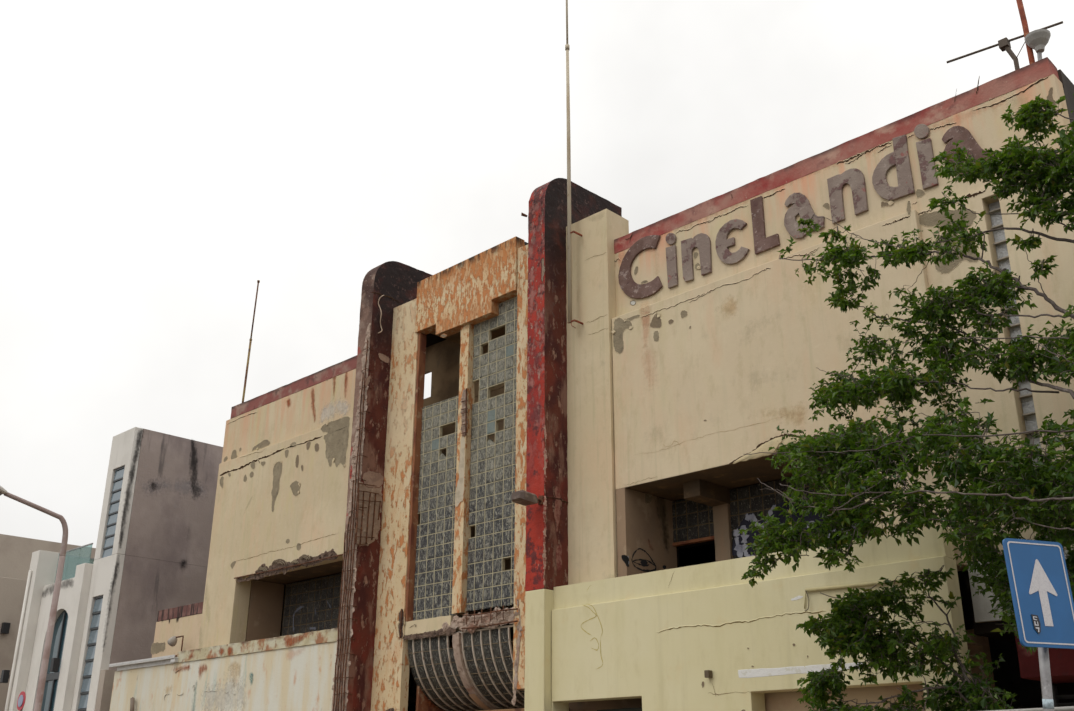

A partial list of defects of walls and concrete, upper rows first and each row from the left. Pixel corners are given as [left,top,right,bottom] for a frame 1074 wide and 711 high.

crack [836,76,1048,164]
crack [966,189,985,198]
flaking render [611,300,692,354]
water stain [191,440,200,497]
crack [220,427,345,476]
spalling [220,323,390,711]
spalling [542,427,562,585]
crack [657,610,826,633]